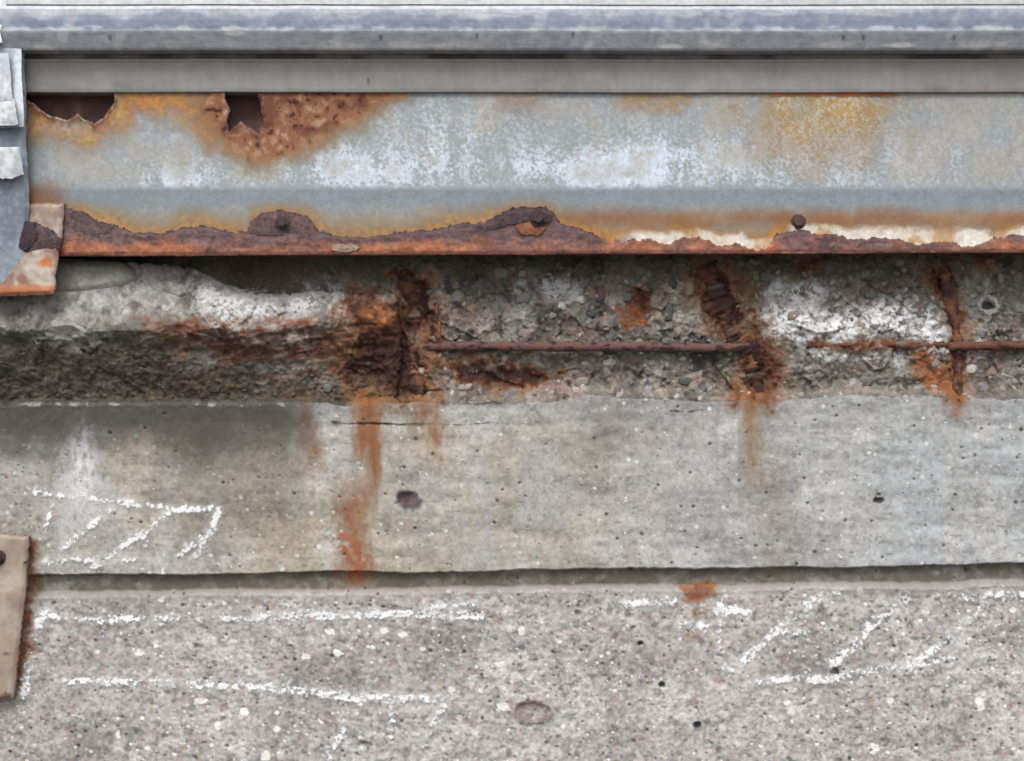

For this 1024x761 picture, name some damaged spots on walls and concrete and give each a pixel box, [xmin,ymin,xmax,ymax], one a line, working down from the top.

corrosion [25,92,407,169]
corrosion [29,187,1024,431]
spalling [80,224,1024,405]
damp [756,281,948,362]
corrosion [162,271,565,582]
corrosion [680,582,716,602]